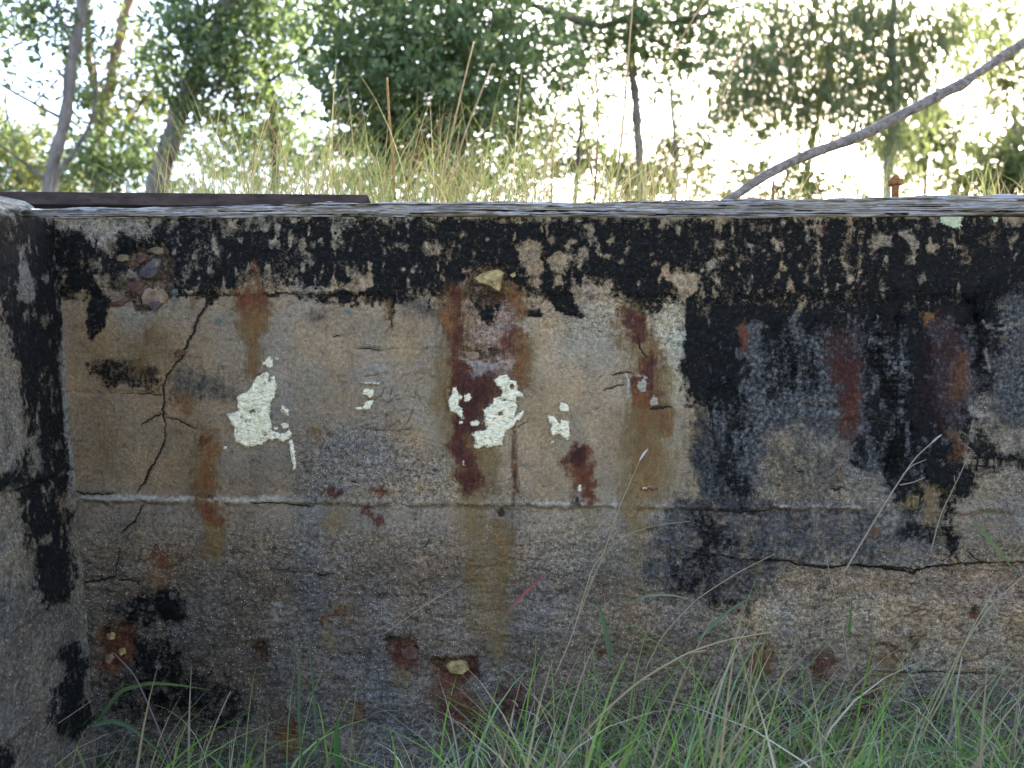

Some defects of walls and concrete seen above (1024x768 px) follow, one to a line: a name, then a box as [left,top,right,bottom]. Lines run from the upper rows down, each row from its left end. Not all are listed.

corrosion [234,259,273,379]
crack [265,290,358,298]
crack [77,292,240,584]
peeling [274,405,297,470]
peeling [448,387,480,427]
corrosion [430,282,535,522]
water stain [0,217,1024,618]
corrosion [561,441,598,529]
corrosion [610,302,679,606]
crack [747,552,1023,575]
water stain [46,638,95,742]
water stain [0,736,20,768]